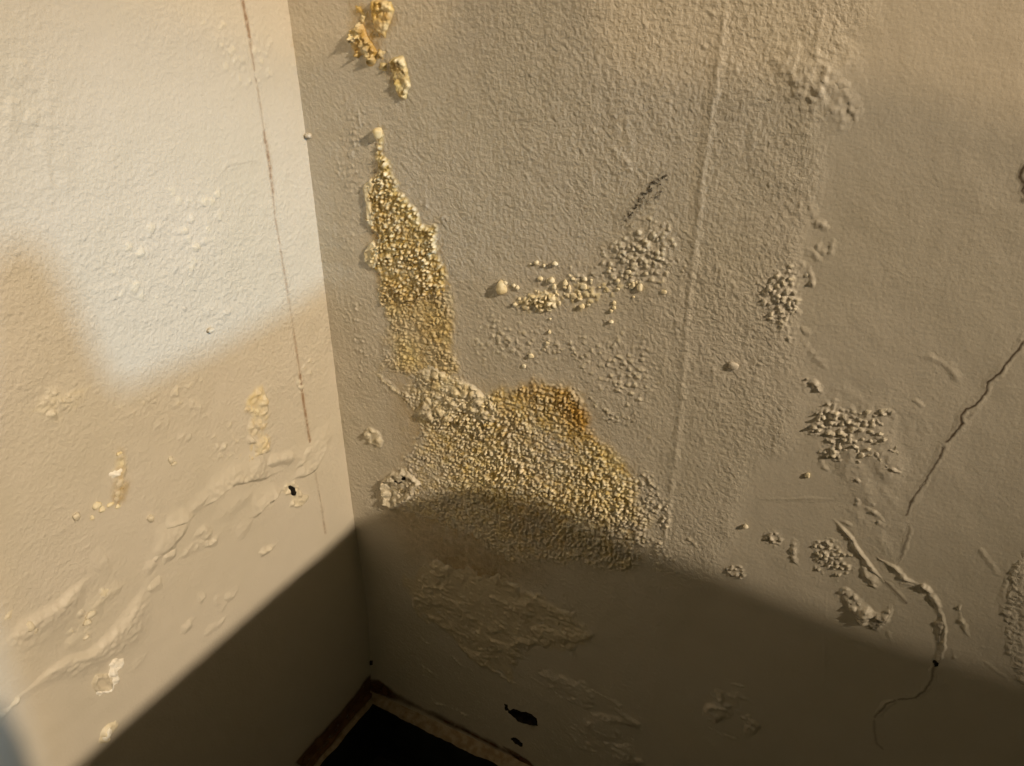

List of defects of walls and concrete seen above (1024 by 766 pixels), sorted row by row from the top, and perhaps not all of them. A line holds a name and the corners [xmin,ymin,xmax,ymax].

leakage [363,127,667,582]
flaking render [832,518,908,646]
crack [870,331,1024,751]